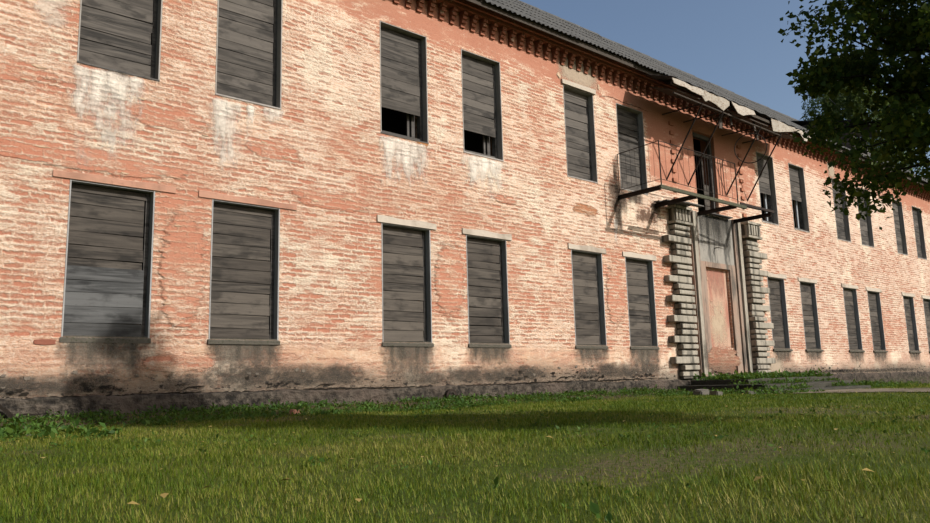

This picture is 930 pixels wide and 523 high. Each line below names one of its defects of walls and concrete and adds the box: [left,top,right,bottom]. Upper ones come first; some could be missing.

leakage [74,66,143,144]
leakage [214,98,283,158]
leakage [382,137,426,179]
leakage [469,156,503,179]
leakage [0,342,148,391]
leakage [210,344,352,385]
leakage [384,346,439,382]
leakage [455,347,535,379]
leakage [579,349,659,376]